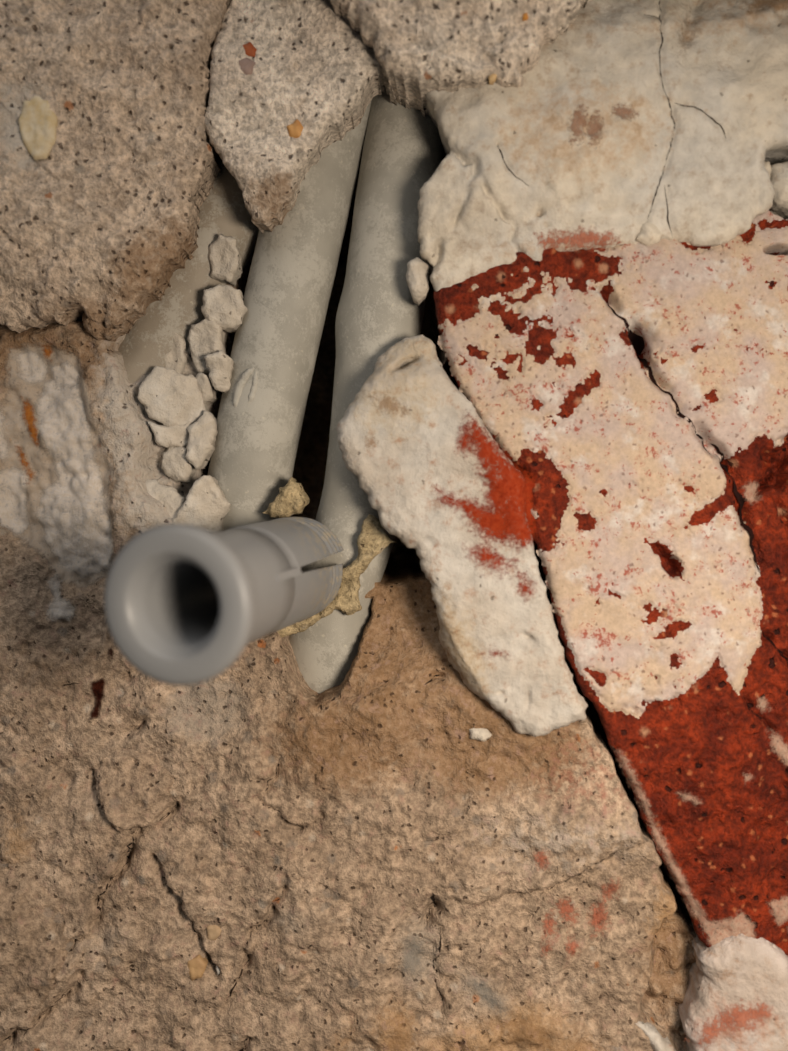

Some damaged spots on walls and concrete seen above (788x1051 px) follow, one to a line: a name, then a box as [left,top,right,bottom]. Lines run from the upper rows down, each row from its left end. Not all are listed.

spalling [570,104,602,145]
spalling [614,105,637,119]
crack [647,0,726,234]
peeling [438,210,788,719]
crack [602,293,761,575]
peeling [770,732,788,766]
crack [2,939,82,1042]
crack [97,804,177,912]
crack [227,881,286,1002]
crack [426,892,444,1016]
peeling [616,750,705,917]
peeling [769,898,788,925]